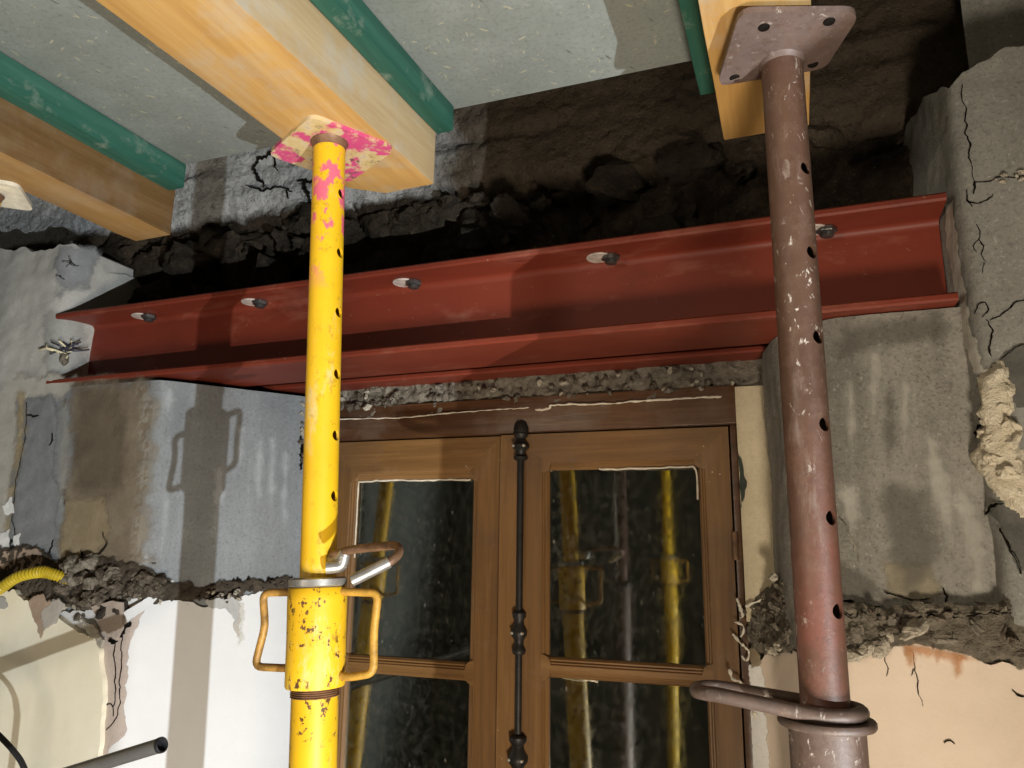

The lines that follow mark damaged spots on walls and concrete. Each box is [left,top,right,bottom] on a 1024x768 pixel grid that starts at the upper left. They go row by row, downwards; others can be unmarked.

crack [246,151,312,203]
crack [961,84,1024,274]
crack [974,300,1024,356]
spalling [999,344,1024,408]
peeling [0,373,293,755]
spalling [728,573,797,687]
spalling [843,598,1024,670]
crack [106,633,123,730]
crack [884,652,923,705]
peeling [751,710,769,768]